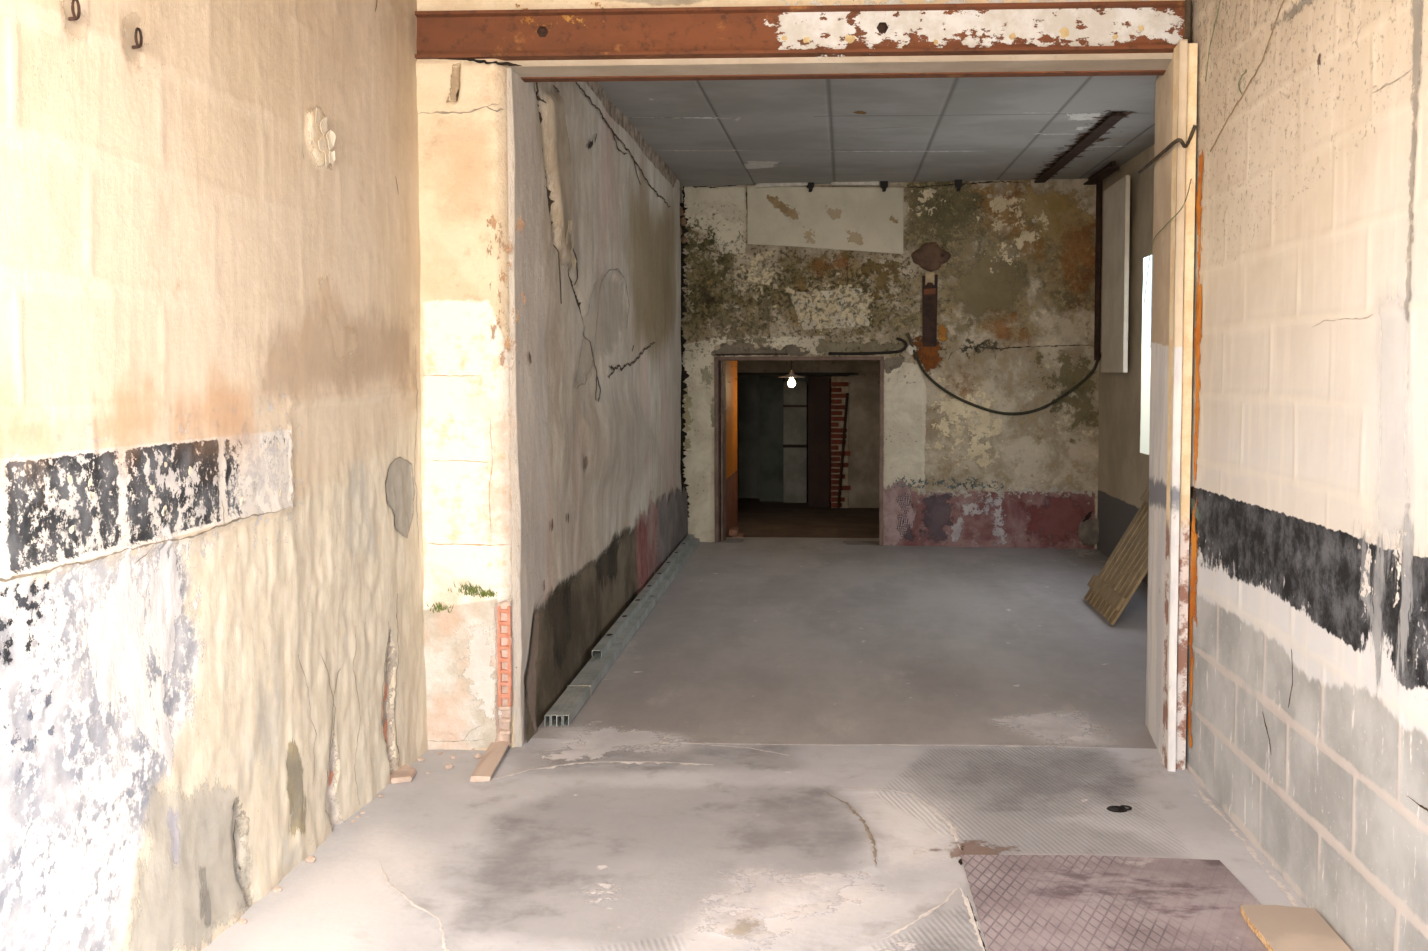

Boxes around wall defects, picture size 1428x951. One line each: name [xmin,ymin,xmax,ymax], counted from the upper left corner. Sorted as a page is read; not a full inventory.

corrosion [505,2,604,31]
peeling [764,0,1193,61]
crack [1371,56,1424,94]
peeling [972,181,1049,274]
crack [418,58,747,517]
peeling [711,249,874,357]
corrosion [912,324,948,373]
crack [414,344,508,547]
water stain [883,481,955,546]
water stain [1019,495,1102,559]
peeling [3,394,303,782]
water stain [526,486,688,743]